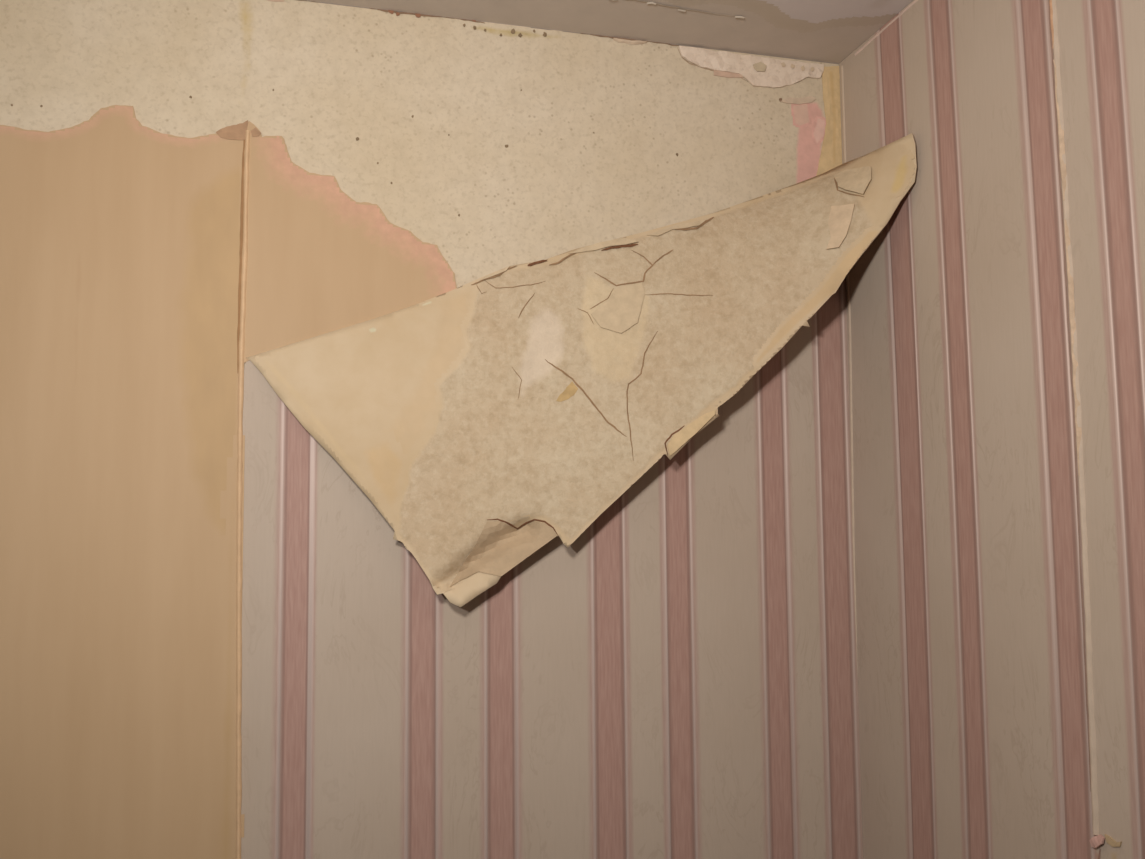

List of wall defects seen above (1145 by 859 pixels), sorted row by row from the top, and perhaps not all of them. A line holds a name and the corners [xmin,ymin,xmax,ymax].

peeling [0,0,917,607]